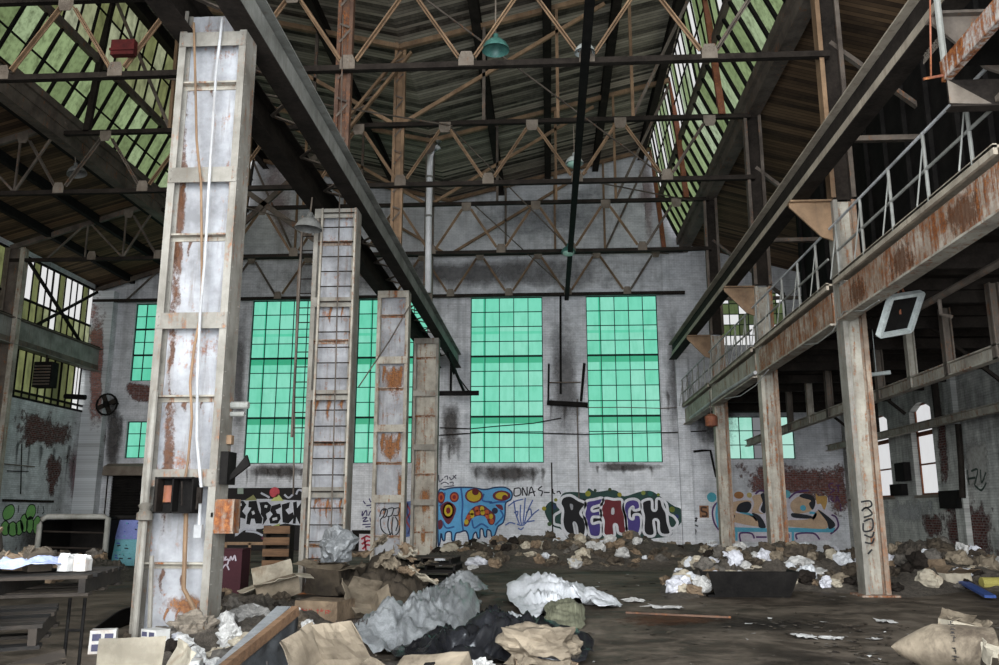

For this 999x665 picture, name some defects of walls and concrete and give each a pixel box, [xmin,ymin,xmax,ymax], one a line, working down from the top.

rust [946,192,980,234]
rust [170,183,192,313]
rust [889,242,915,277]
rust [849,278,866,305]
rust [382,366,403,387]
flaking render [15,409,72,496]
rust [162,390,188,469]
rust [380,433,401,462]
flaking render [735,463,764,493]
flaking render [784,463,848,515]